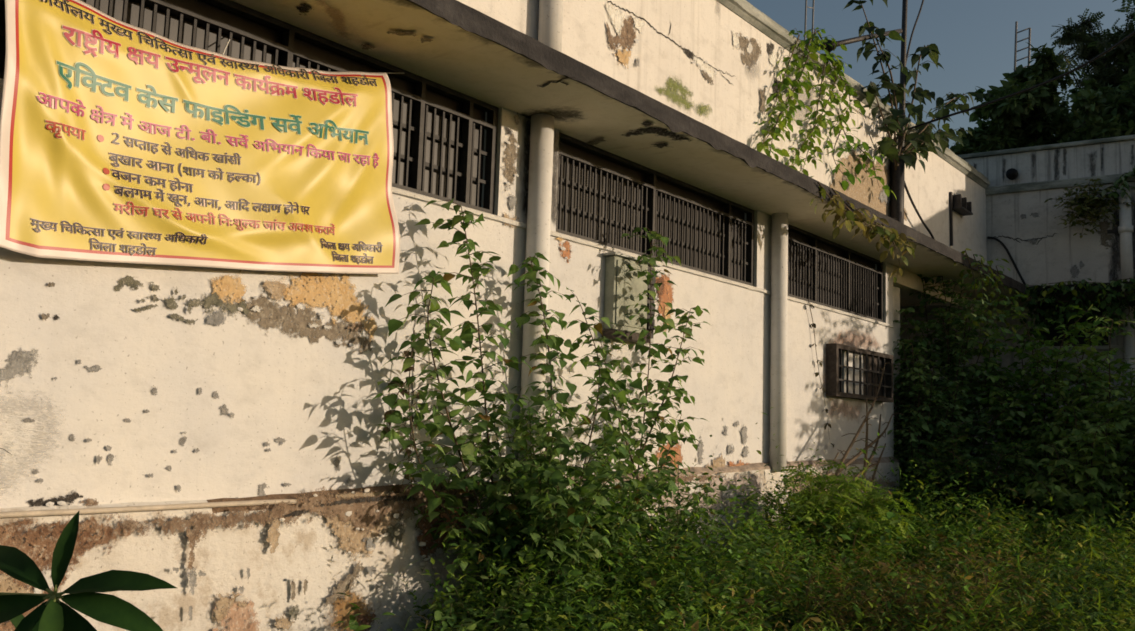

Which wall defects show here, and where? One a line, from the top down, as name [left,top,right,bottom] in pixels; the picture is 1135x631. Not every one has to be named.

flaking render [605,4,645,69]
crack [585,1,733,84]
flaking render [732,31,762,70]
peeling [114,270,377,354]
peeling [0,349,38,386]
flaking render [0,469,144,631]
flaking render [211,567,260,631]
peeling [275,578,308,630]